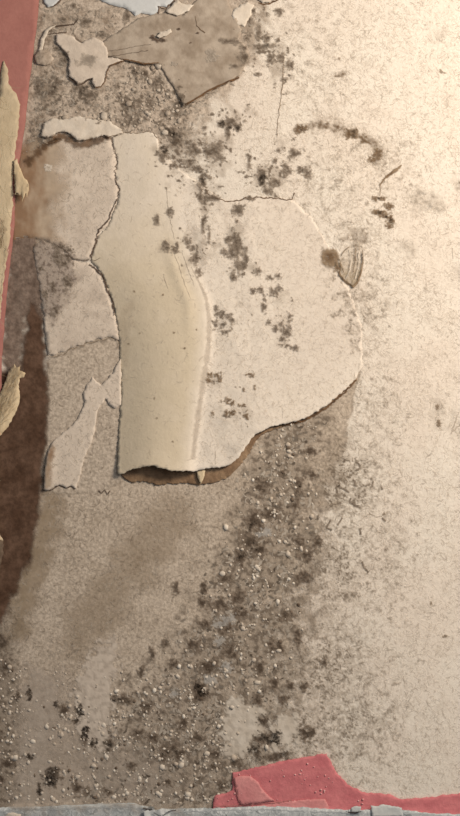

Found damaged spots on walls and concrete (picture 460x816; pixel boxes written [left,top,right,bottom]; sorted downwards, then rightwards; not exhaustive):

crack [53,136,120,315]
peeling [0,0,274,436]
leakage [29,63,383,351]
leakage [372,165,402,229]
peeling [0,330,361,816]
leakage [0,240,383,809]